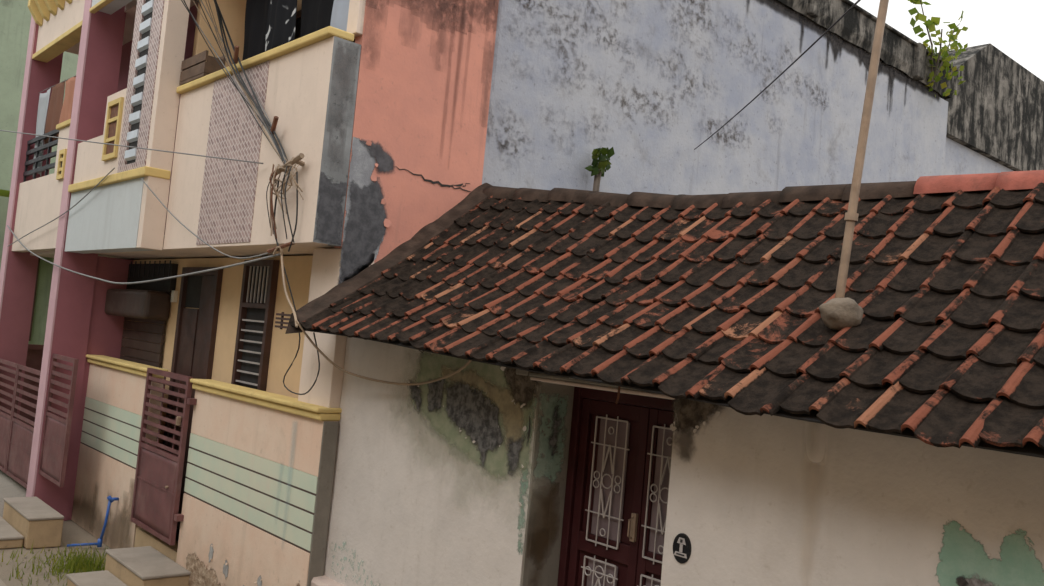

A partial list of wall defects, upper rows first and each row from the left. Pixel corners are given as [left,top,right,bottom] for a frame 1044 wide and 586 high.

damp [748,0,940,109]
peeling [338,137,394,285]
crack [396,166,471,192]
peeling [407,351,539,553]
flaking render [186,544,228,586]
damp [528,488,558,560]
peeling [936,520,1044,586]